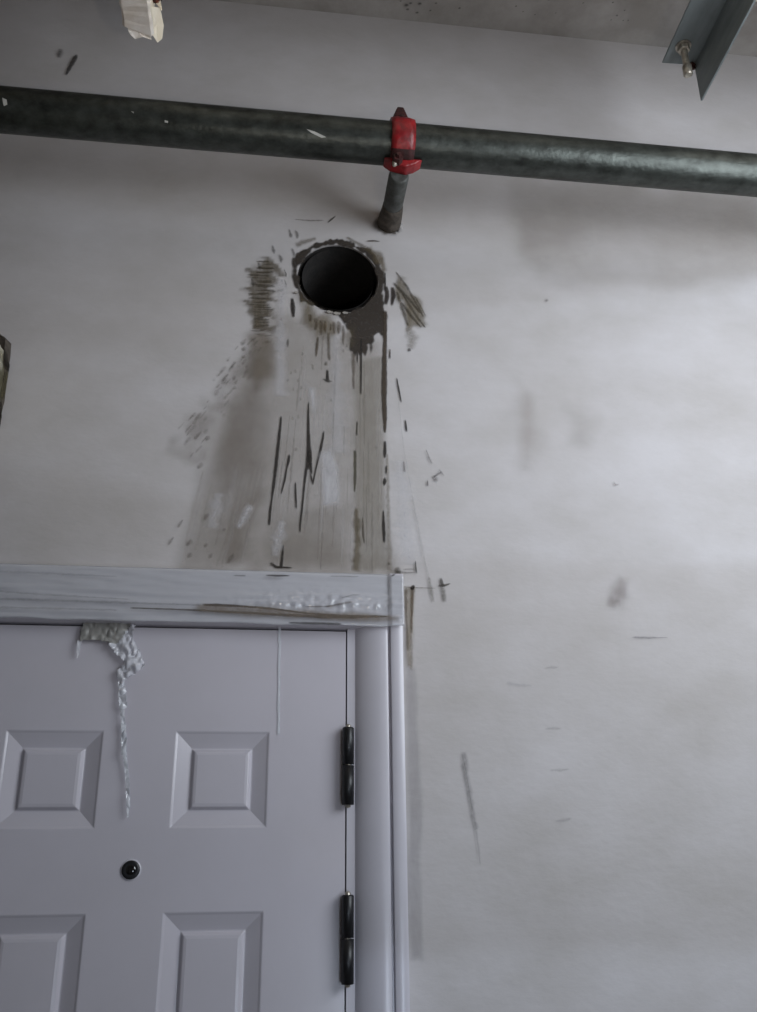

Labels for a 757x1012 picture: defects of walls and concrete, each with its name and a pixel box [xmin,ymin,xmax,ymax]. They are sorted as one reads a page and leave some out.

water stain [354,511,364,570]